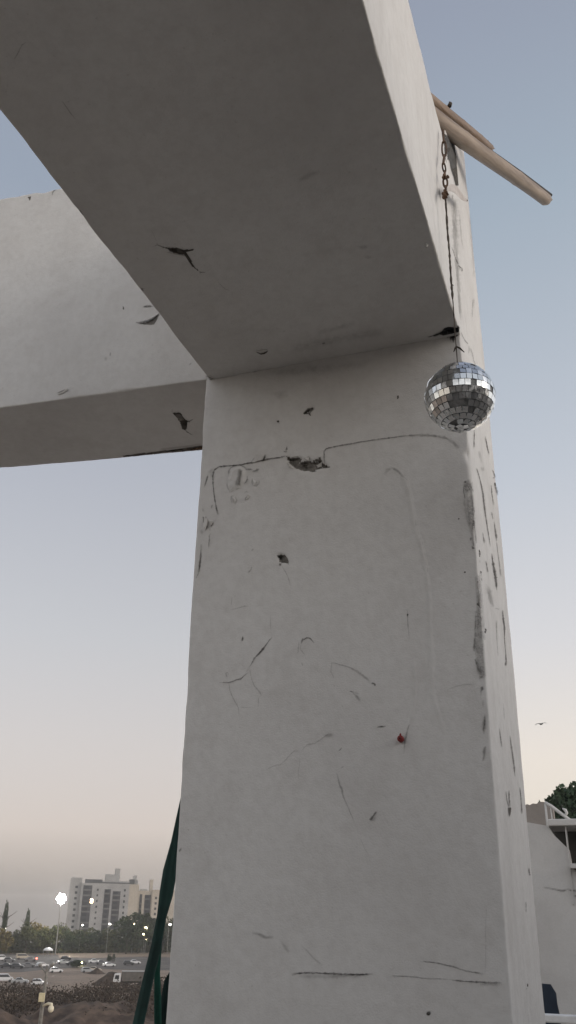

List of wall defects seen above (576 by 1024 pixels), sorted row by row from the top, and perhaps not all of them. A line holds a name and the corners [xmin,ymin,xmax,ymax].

crack [158,245,203,273]
spalling [173,413,193,434]
spalling [284,448,330,472]
crack [205,457,281,511]